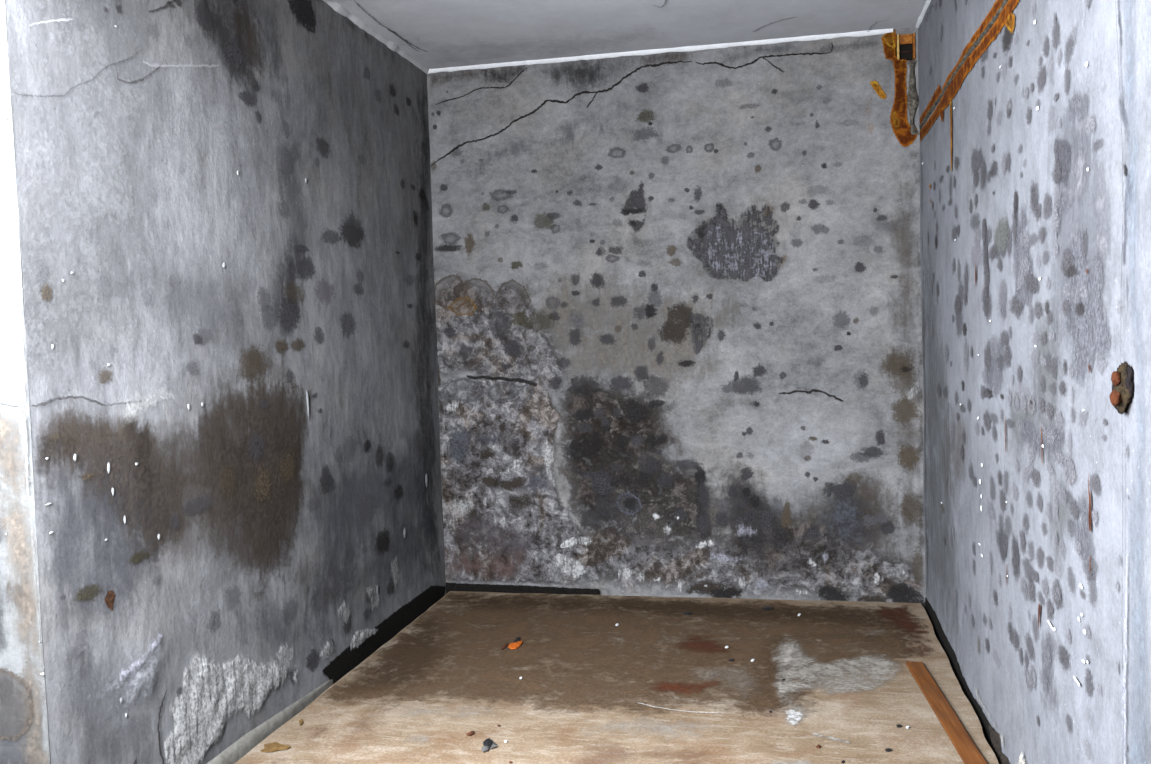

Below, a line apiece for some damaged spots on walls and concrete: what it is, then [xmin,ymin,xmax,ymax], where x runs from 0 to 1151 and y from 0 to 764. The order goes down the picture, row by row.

leakage [462,67,522,82]
leakage [553,62,600,81]
crack [431,42,833,166]
corrosion [870,0,1019,170]
leakage [0,416,38,651]
crack [31,396,106,407]
leakage [42,244,335,608]
peeling [438,366,590,586]
leakage [157,108,1010,764]
leakage [924,13,1110,691]
leakage [0,664,47,764]
leakage [1084,655,1093,701]